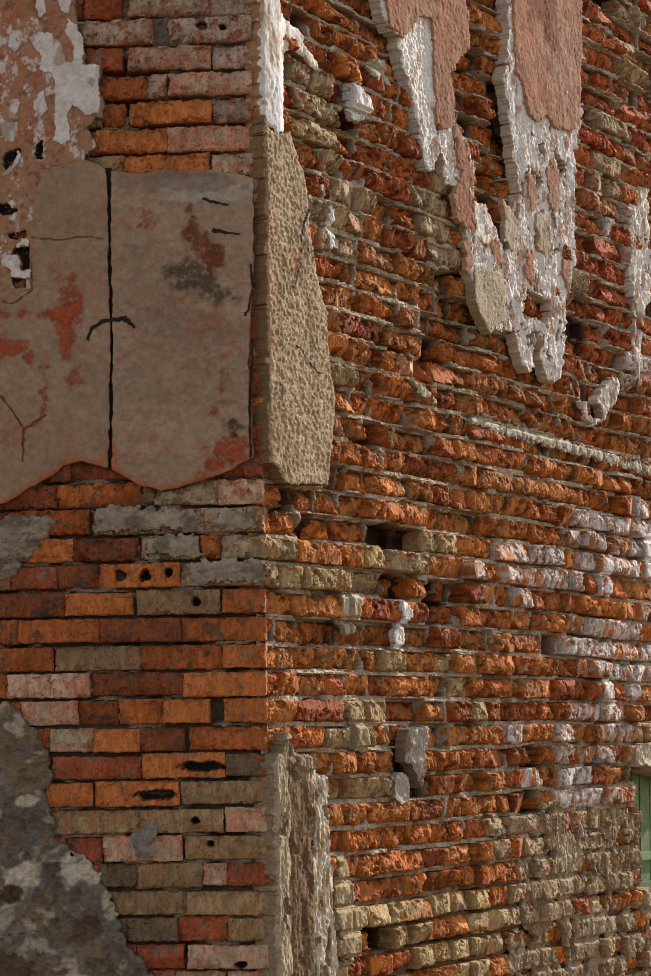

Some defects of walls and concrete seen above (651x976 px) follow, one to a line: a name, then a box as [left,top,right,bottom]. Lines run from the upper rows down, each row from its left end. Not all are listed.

peeling [8,0,101,160]
peeling [1,98,21,176]
spalling [0,204,18,215]
peeling [0,234,31,290]
crack [287,207,311,299]
peeling [368,0,603,385]
crack [0,168,135,470]